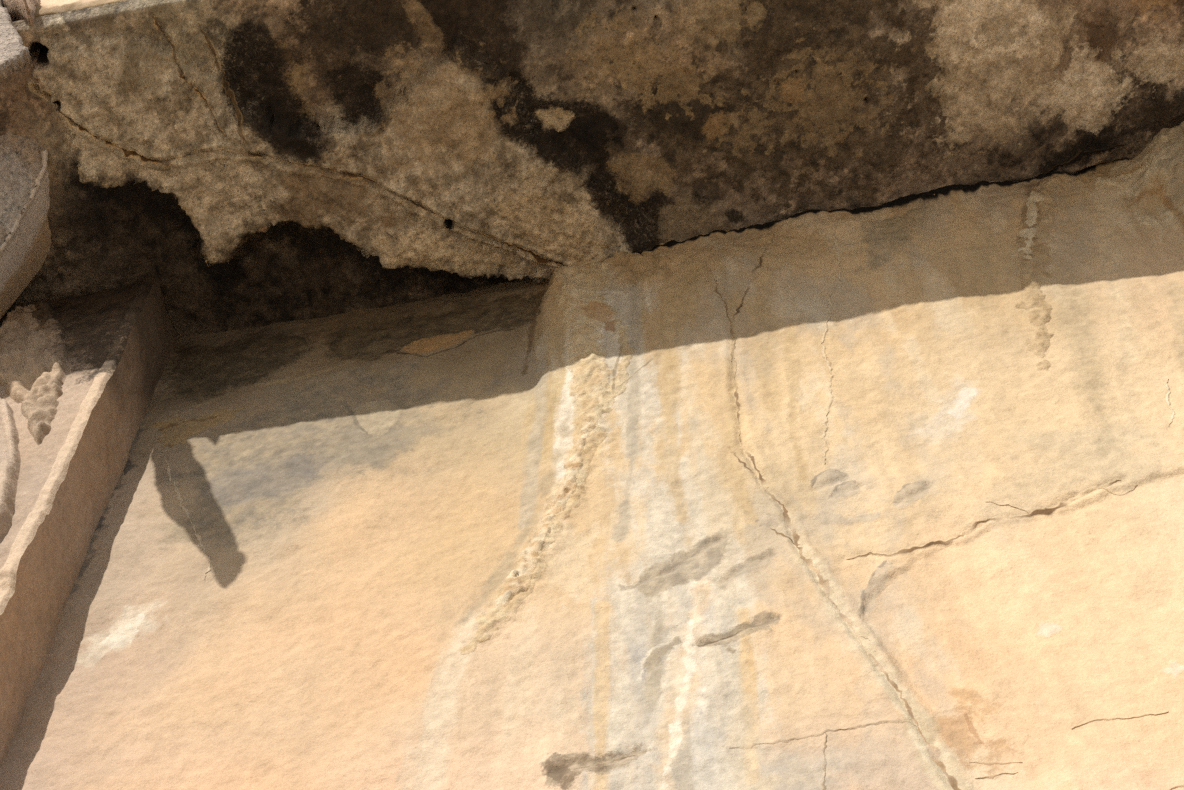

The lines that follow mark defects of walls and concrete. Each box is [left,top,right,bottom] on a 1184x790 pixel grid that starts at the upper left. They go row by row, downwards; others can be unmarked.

crack [37,12,564,267]
damp [211,0,429,167]
damp [419,0,981,279]
damp [1079,7,1127,62]
damp [895,79,1184,552]
crack [649,131,1137,790]